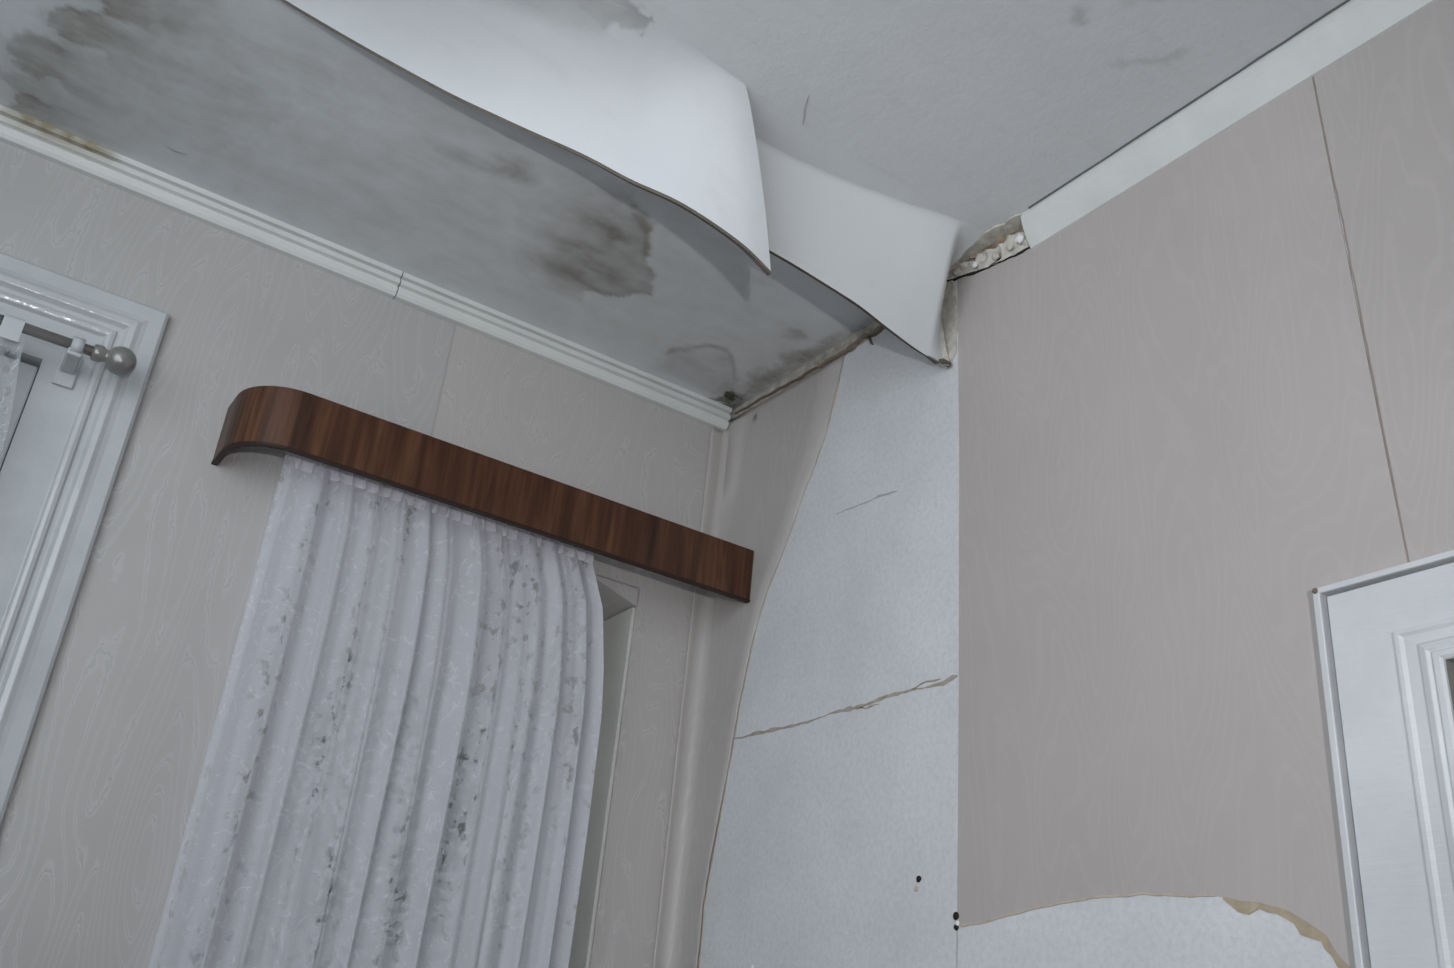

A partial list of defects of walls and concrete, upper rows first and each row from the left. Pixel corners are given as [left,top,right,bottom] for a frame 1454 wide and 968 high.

flaking render [941,213,1029,363]
crack [733,675,958,739]